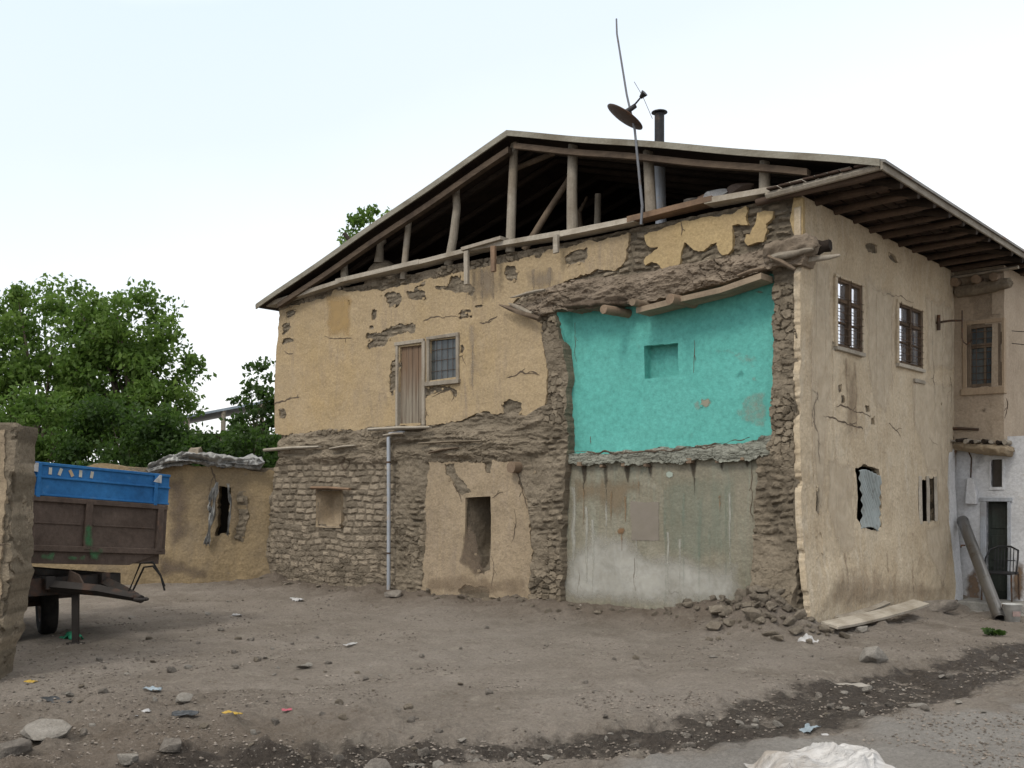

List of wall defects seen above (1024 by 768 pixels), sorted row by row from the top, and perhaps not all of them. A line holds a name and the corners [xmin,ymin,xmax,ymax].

flaking render [565,248,588,267]
flaking render [505,266,519,282]